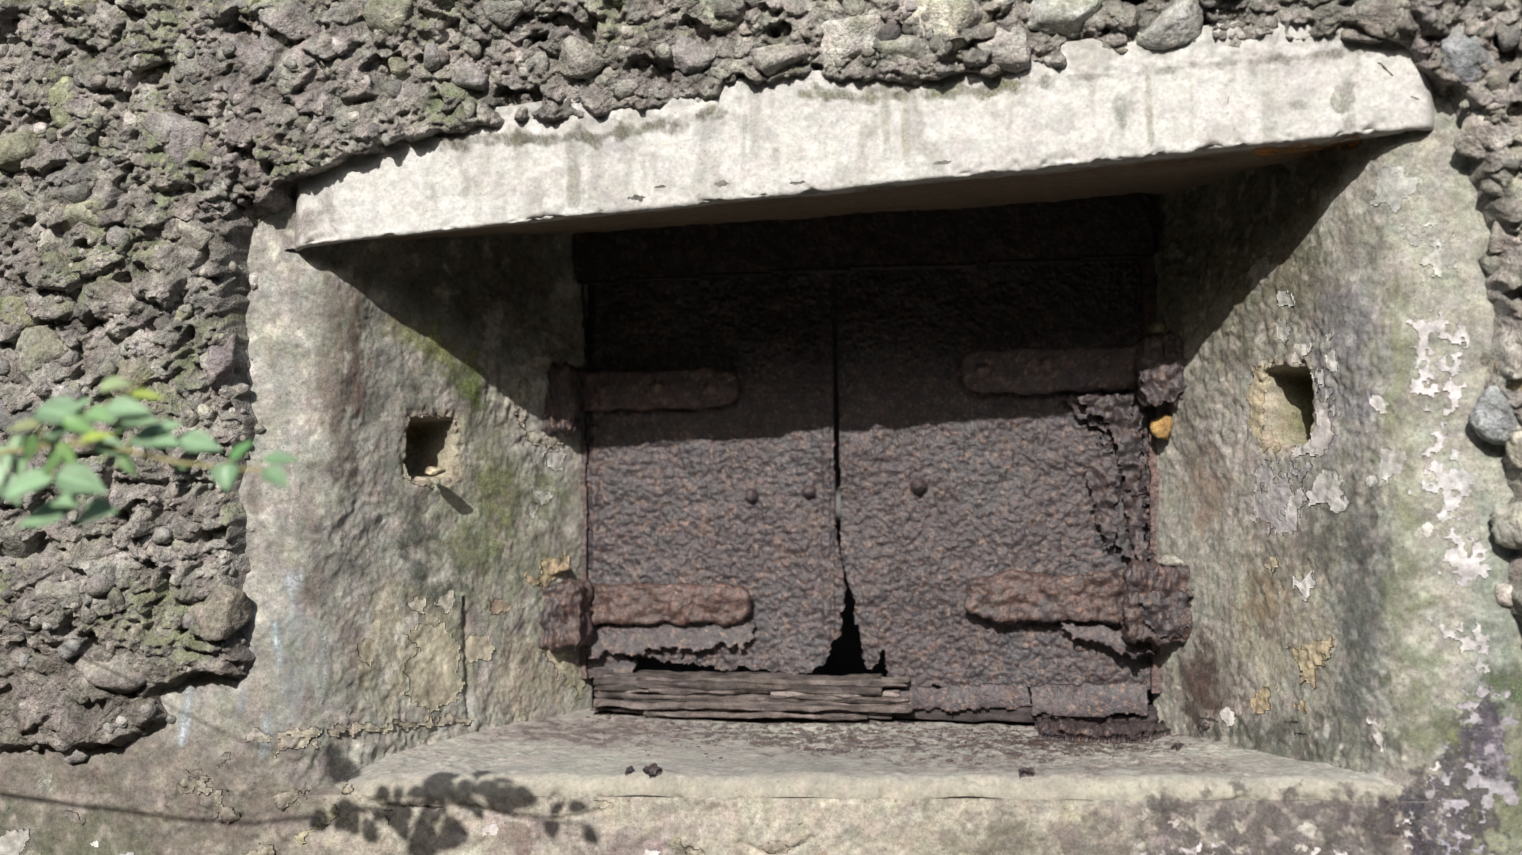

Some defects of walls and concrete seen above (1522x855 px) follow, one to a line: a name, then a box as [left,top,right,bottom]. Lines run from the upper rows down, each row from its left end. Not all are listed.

spalling [1246,290,1351,536]
peeling [1365,165,1491,586]
spalling [524,553,579,586]
peeling [1265,556,1317,601]
peeling [402,589,495,713]
spalling [541,648,586,698]
spalling [1197,686,1278,734]
spalling [1286,635,1335,713]